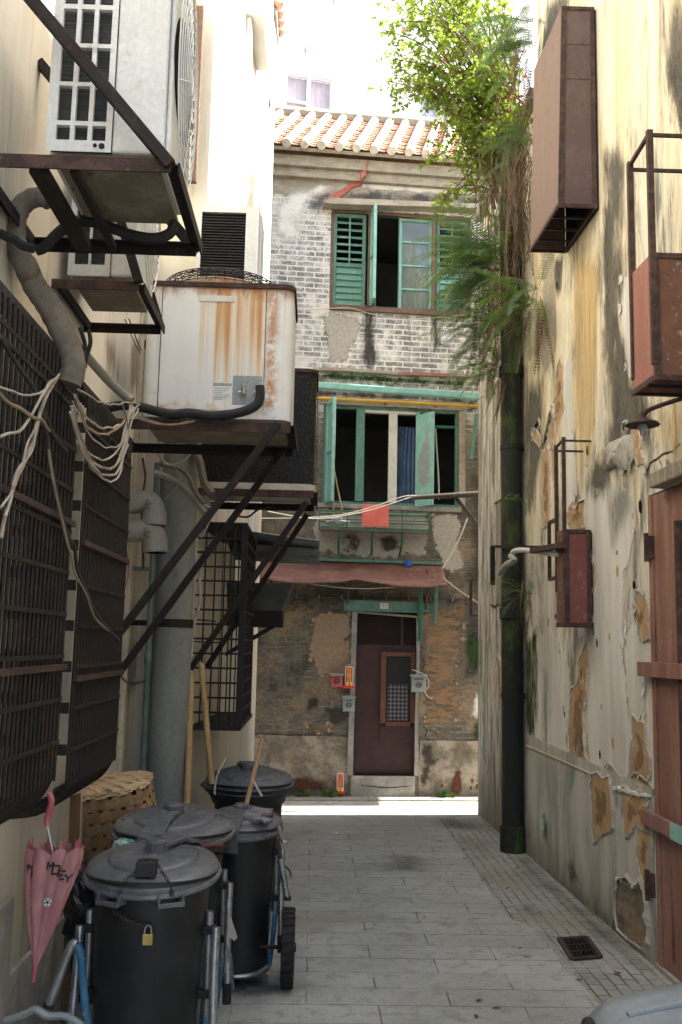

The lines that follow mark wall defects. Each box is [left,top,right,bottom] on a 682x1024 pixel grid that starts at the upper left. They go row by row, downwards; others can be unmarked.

water stain [363,313,376,367]
peeling [308,611,352,677]
peeling [423,610,478,724]
peeling [531,253,654,957]